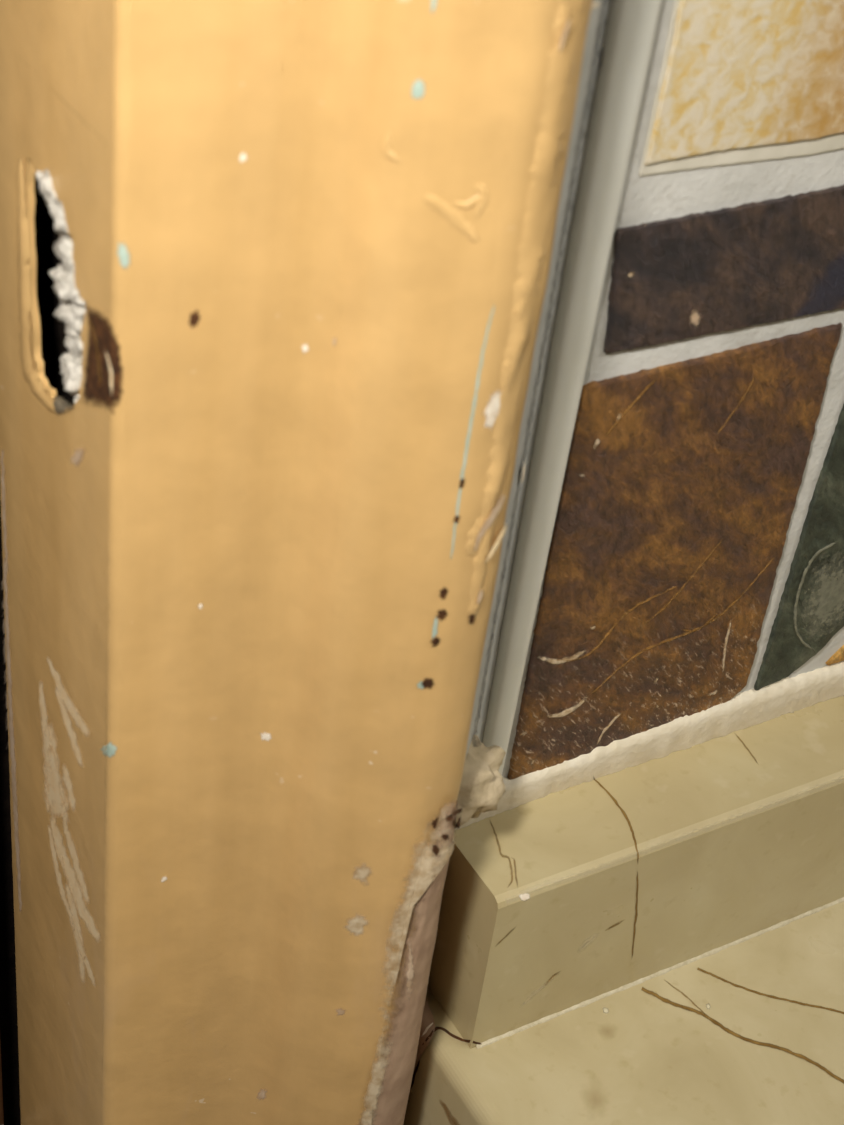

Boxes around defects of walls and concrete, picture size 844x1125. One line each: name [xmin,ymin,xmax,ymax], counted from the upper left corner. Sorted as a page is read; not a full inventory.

spalling [17,157,123,415]
peeling [117,243,130,268]
spalling [431,809,462,856]
crack [594,779,639,956]
crack [410,1023,481,1089]
crack [641,968,844,1083]